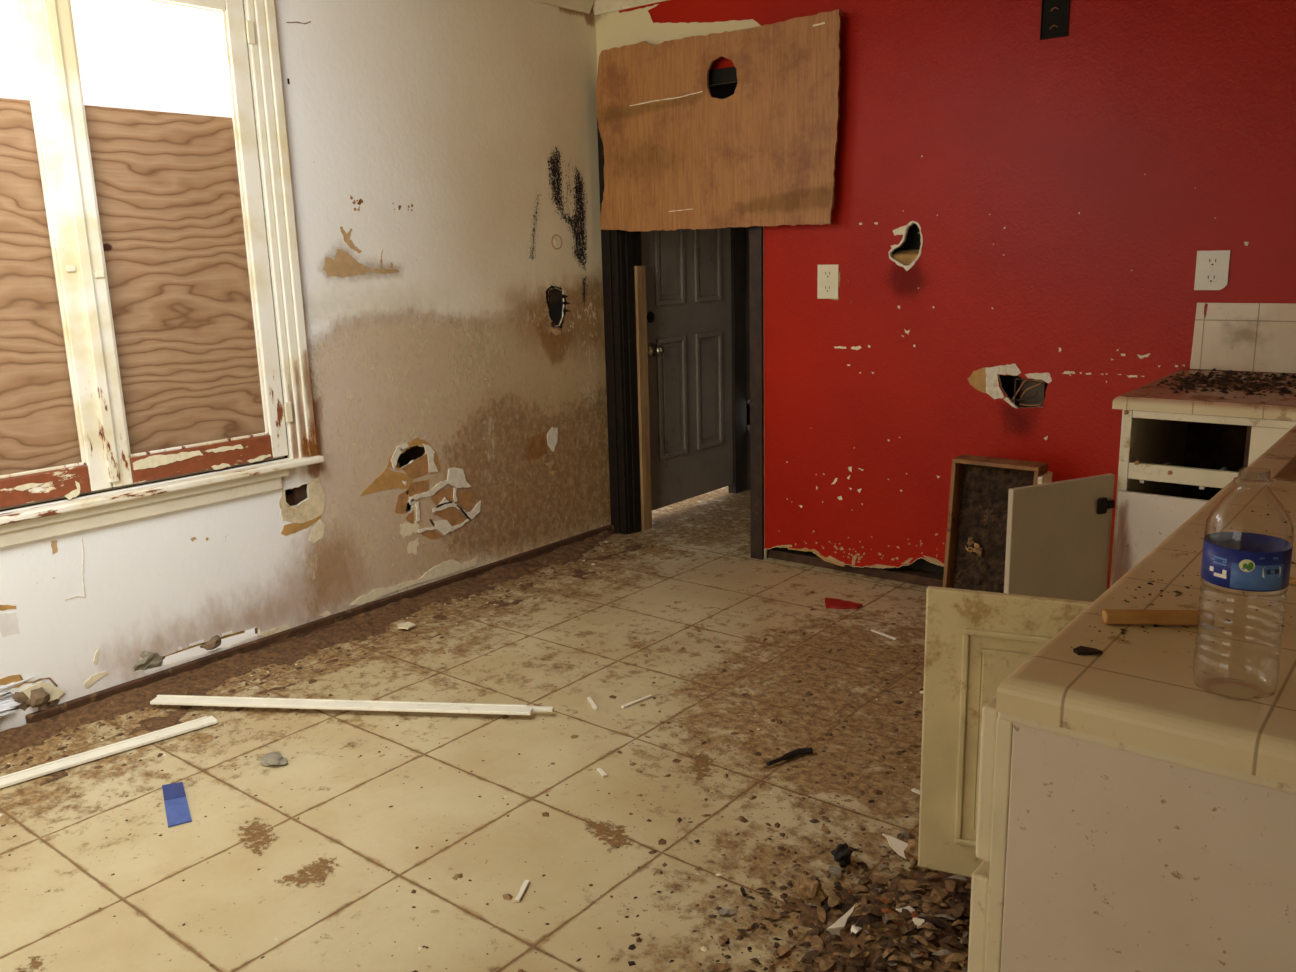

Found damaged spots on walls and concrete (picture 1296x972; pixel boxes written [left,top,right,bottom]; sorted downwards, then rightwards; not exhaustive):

peeling [323,226,399,278]
spalling [888,210,923,271]
spalling [546,286,570,335]
spalling [967,349,1185,409]
peeling [133,444,271,470]
peeling [13,483,44,491]
peeling [65,481,80,500]
flaking render [359,437,481,555]
peeling [775,530,944,569]
flaking render [0,674,66,718]